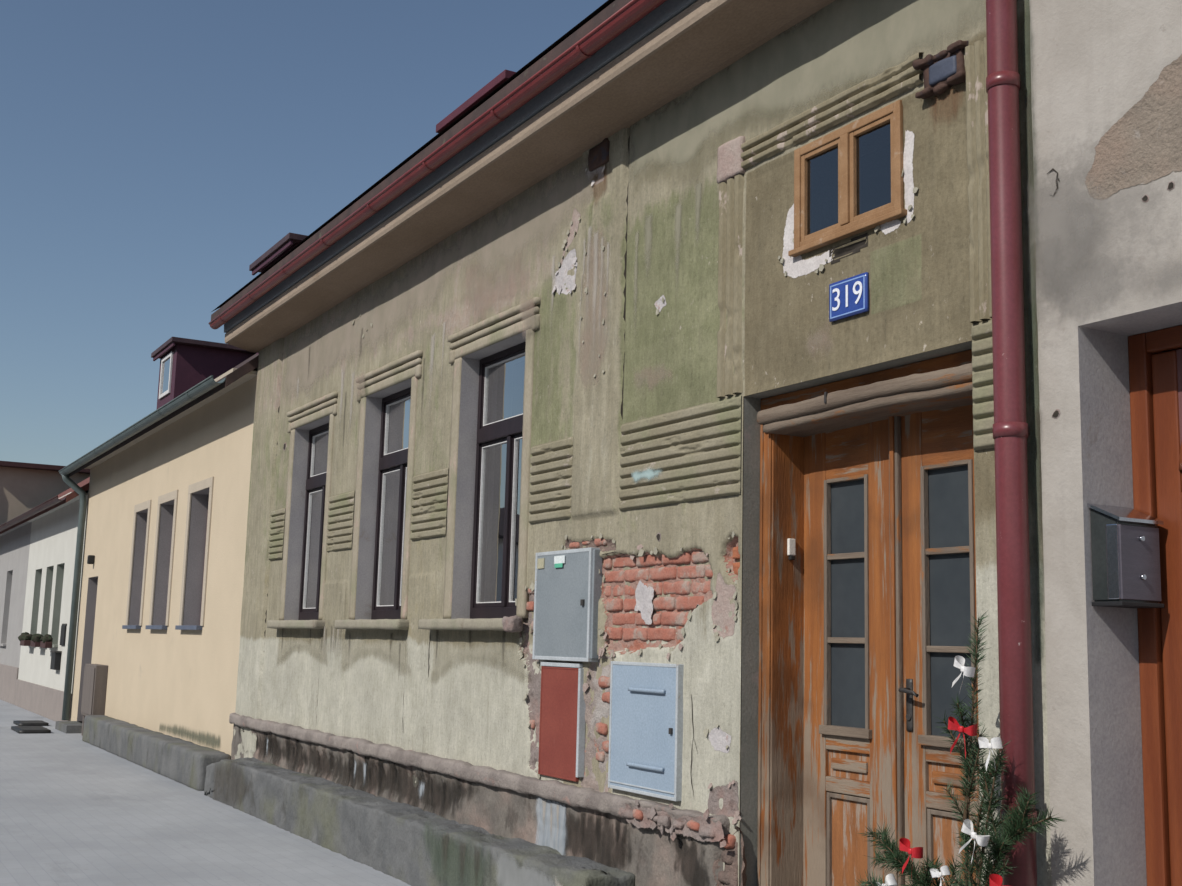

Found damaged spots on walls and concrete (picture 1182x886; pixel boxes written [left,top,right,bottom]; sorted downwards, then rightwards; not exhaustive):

flaking render [552,208,609,327]
flaking render [778,204,834,278]
damp [630,0,986,175]
flaking render [874,130,919,235]
flaking render [1085,55,1182,202]
flaking render [515,581,541,779]
flaking render [561,531,743,792]
damp [543,801,631,868]
flaking render [620,780,747,886]
damp [674,836,708,886]